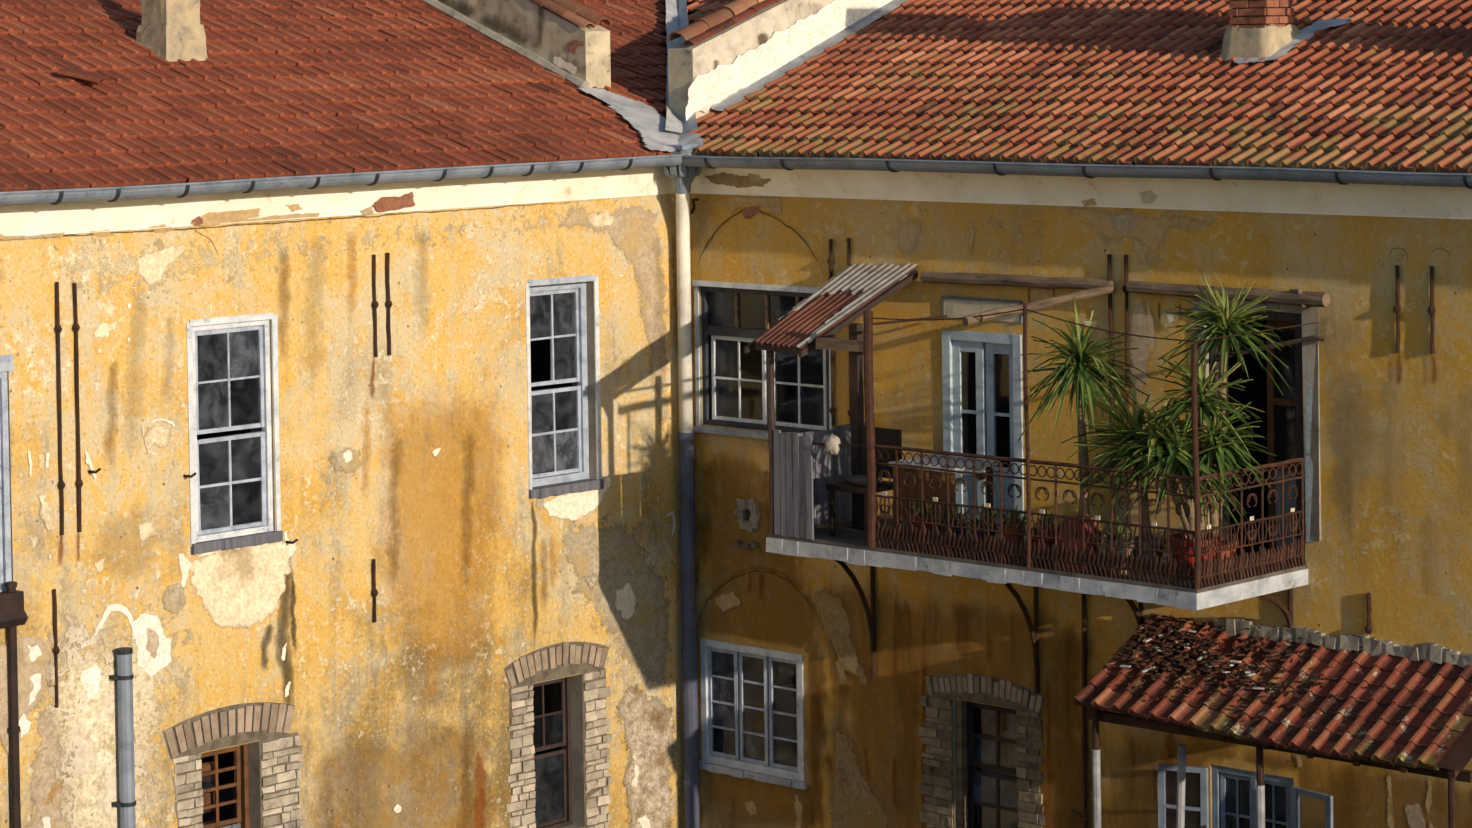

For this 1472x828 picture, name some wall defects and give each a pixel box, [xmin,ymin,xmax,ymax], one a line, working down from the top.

flaking render [38,495,71,531]
flaking render [0,531,297,828]
flaking render [536,477,685,828]
water stain [476,757,484,828]
flaking render [1387,774,1433,828]